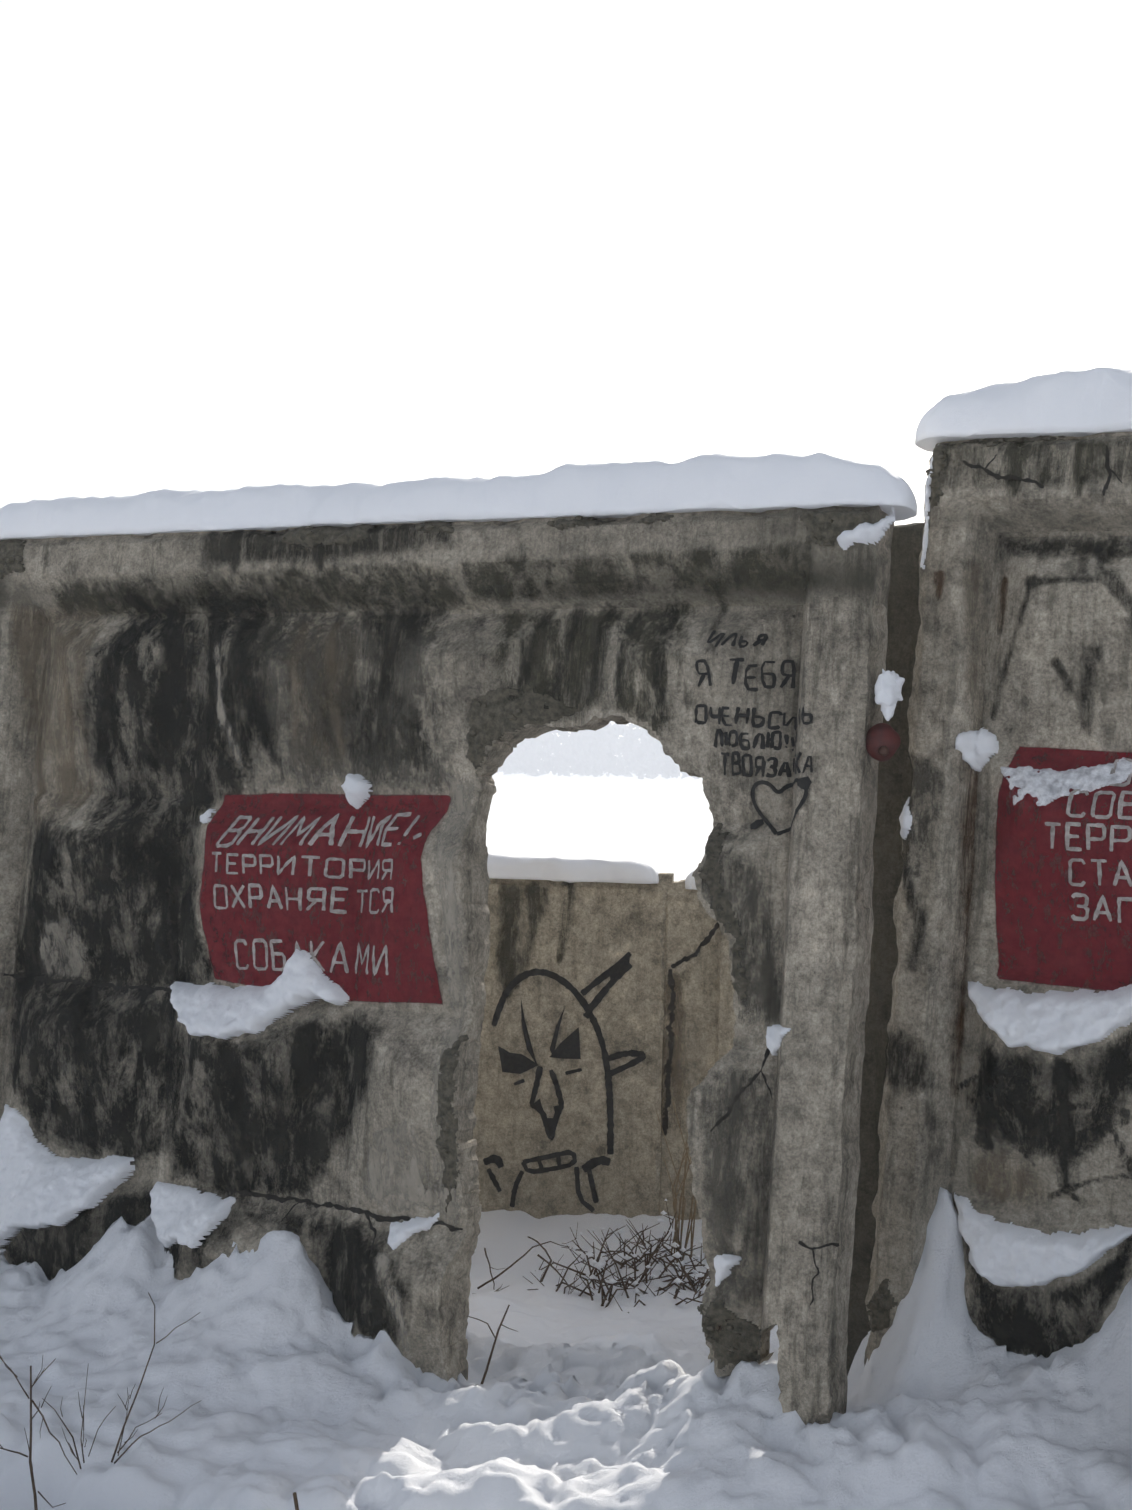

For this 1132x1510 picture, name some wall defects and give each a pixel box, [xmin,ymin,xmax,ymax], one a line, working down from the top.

damp [497,603,691,736]
damp [999,535,1132,685]
damp [1052,647,1103,732]
damp [5,523,473,1350]
damp [497,882,574,996]
spalling [699,823,750,1005]
damp [698,850,781,1035]
damp [704,1072,776,1304]
damp [967,1031,1132,1202]